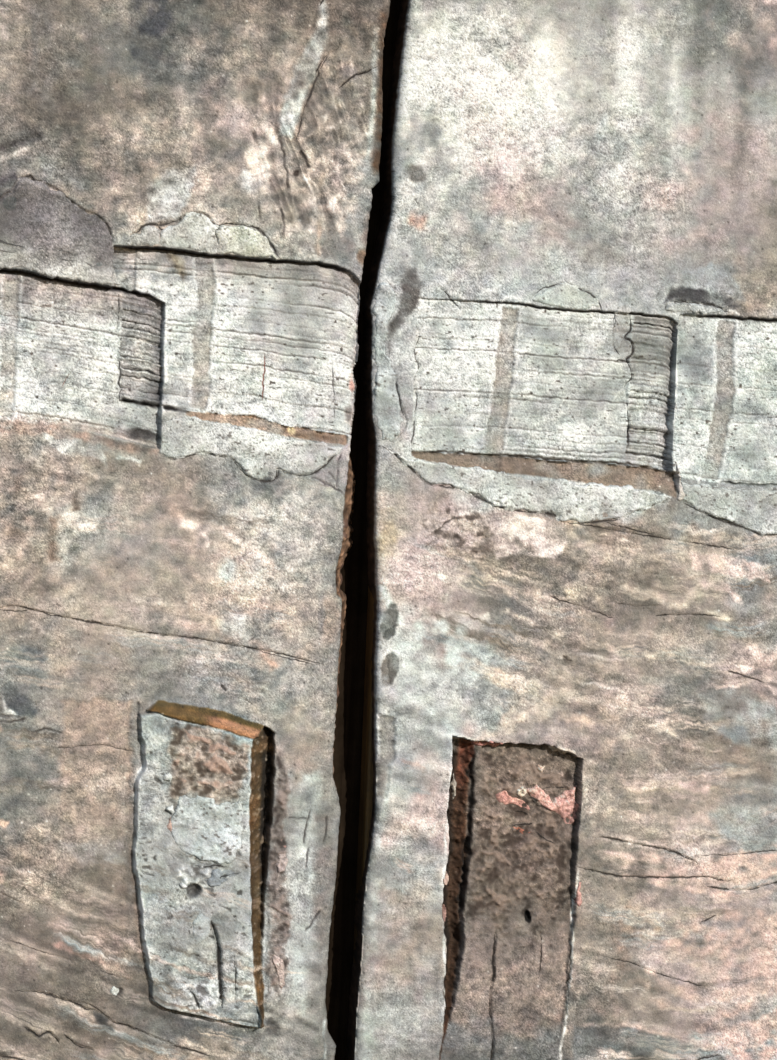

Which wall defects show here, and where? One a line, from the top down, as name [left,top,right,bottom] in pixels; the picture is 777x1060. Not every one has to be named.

water stain [757,0,777,78]
crack [291,42,378,144]
water stain [760,176,777,219]
peeling [159,416,343,483]
peeling [372,281,777,536]
crack [0,606,322,665]
spalling [163,722,252,889]
spalling [260,741,294,1013]
spalling [463,741,583,941]
crack [577,837,777,923]
peeling [192,913,211,944]
spalling [192,978,225,1012]